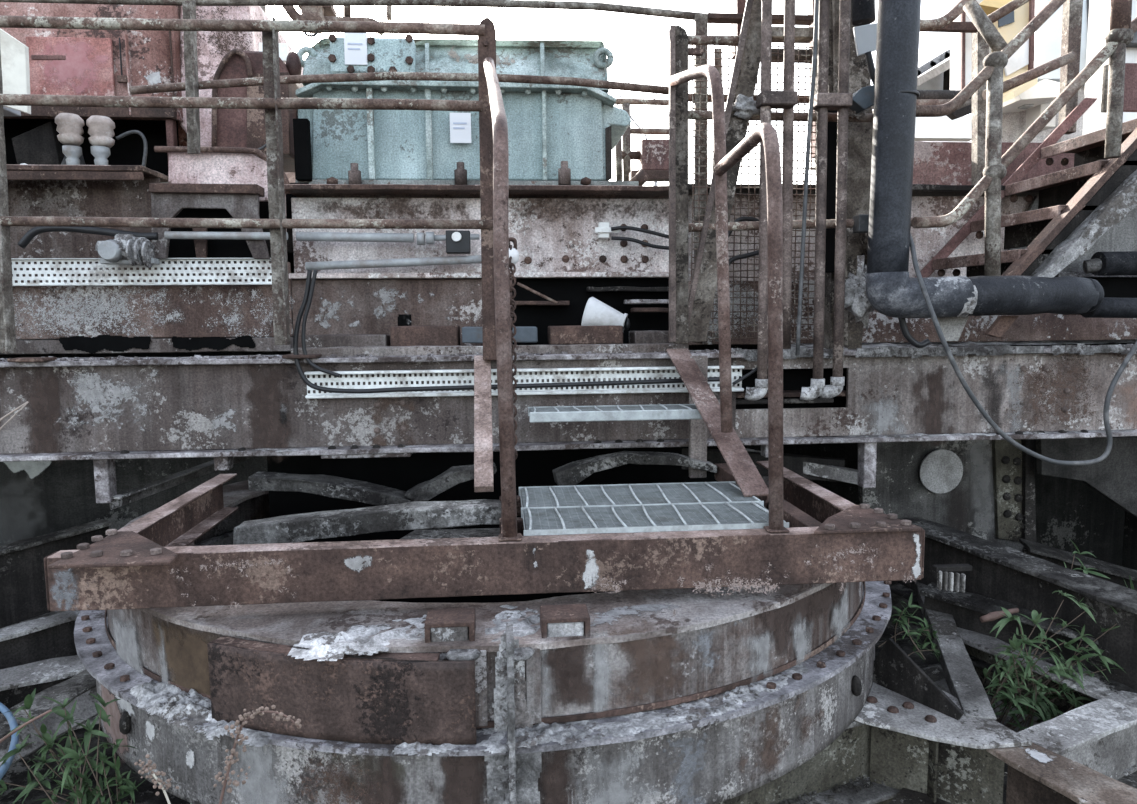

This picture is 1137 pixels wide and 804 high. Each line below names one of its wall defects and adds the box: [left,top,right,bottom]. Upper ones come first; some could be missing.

rust [178,6,253,59]
rust [510,195,669,269]
rust [20,371,66,461]
rust [246,365,291,460]
rust [371,398,415,446]
rust [913,368,953,446]
rust [1007,353,1102,430]
rust [152,617,231,696]
peeling [116,696,155,740]
peeling [186,750,194,768]